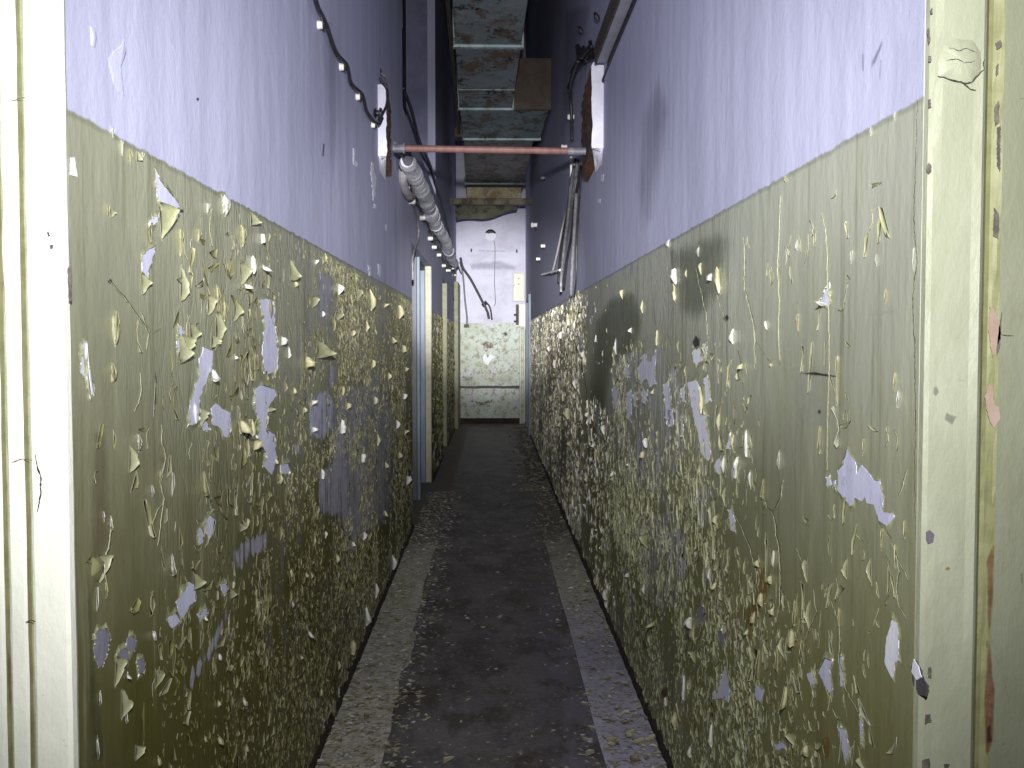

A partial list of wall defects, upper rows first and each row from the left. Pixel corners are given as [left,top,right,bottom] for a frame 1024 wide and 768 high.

crack [939,47,985,90]
peeling [70,157,78,177]
spalling [988,306,1002,356]
peeling [78,337,95,401]
spalling [984,384,1000,428]
peeling [92,127,413,768]
peeling [530,206,932,768]
peeling [85,554,114,611]